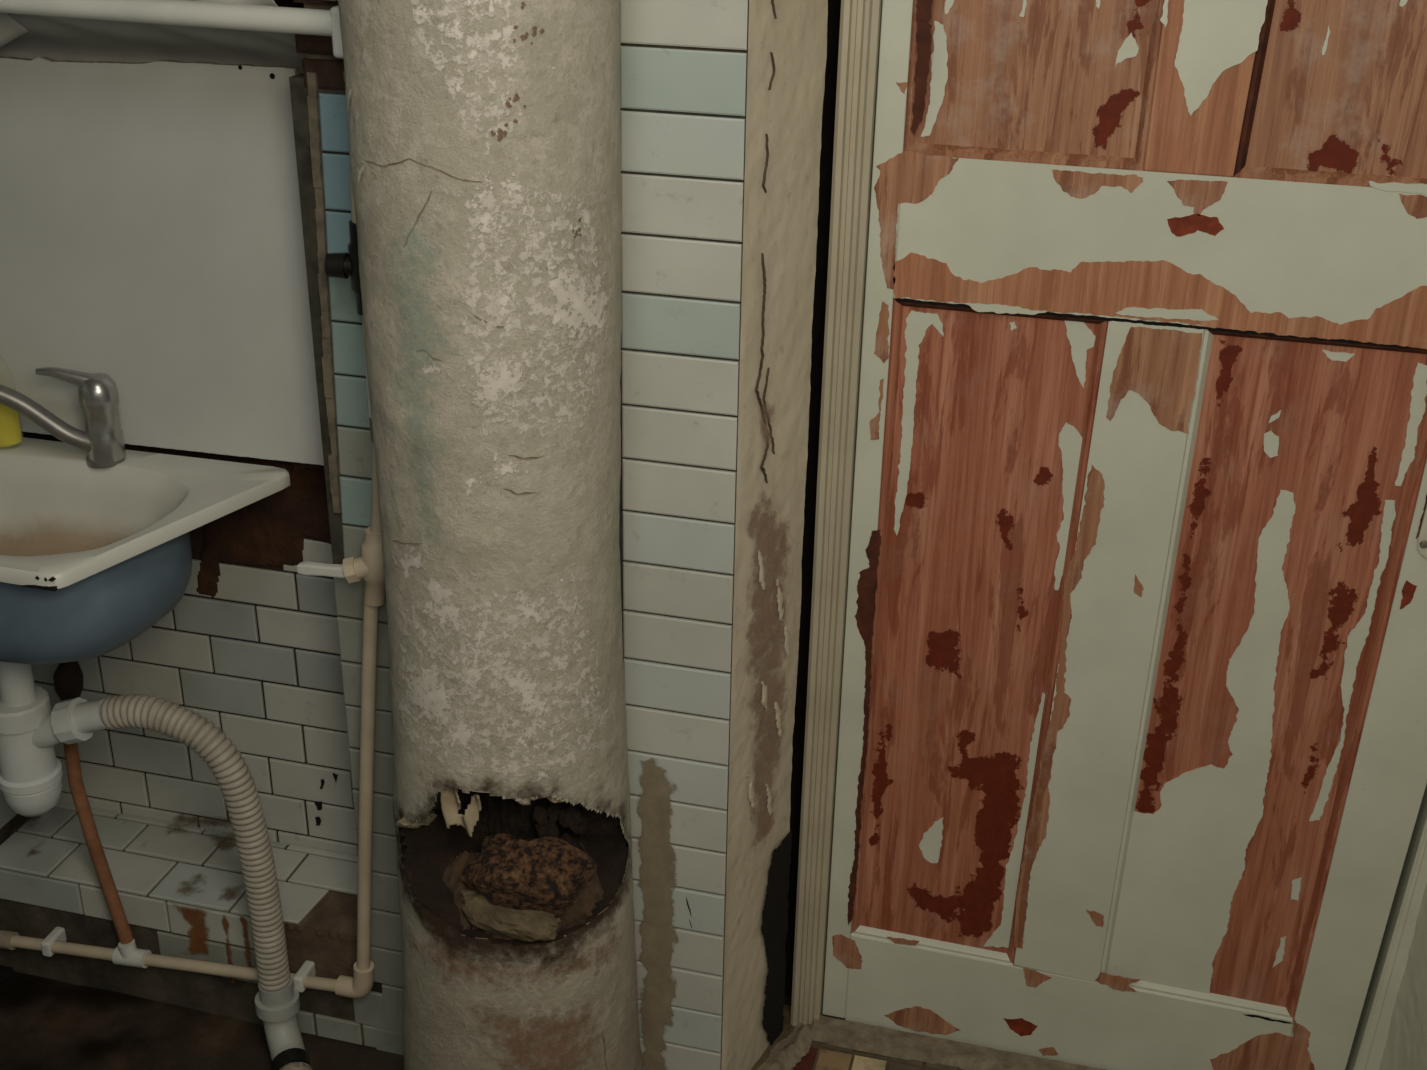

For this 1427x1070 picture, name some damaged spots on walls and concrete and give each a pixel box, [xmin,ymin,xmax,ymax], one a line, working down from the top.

crack [365,158,485,247]
spalling [196,467,331,597]
peeling [832,0,1427,994]
spalling [392,539,630,964]
corrosion [178,875,253,986]
peeling [885,1006,961,1036]
peeling [1003,1018,1058,1056]
peeling [1210,1019,1315,1070]